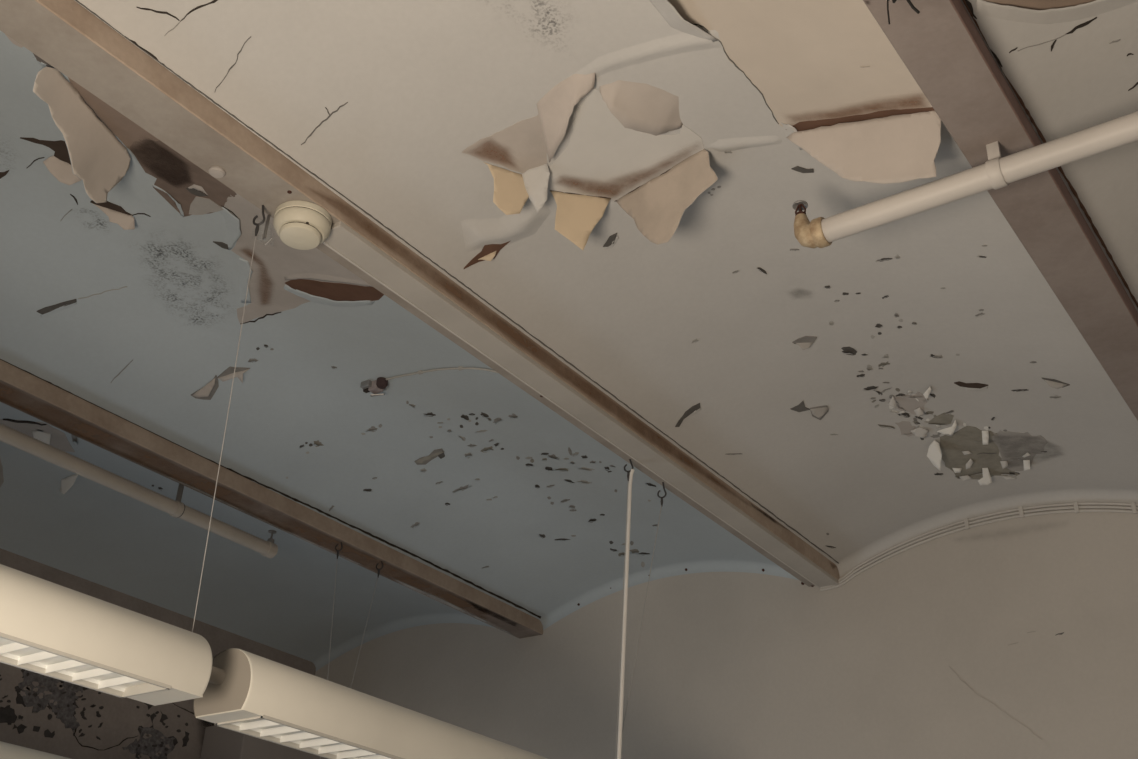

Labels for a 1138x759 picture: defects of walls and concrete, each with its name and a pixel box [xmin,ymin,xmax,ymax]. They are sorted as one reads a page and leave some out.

peeling [976,0,1138,25]
peeling [650,0,941,184]
peeling [462,73,721,251]
crack [75,0,839,564]
peeling [406,401,518,473]
spalling [841,347,1048,485]
peeling [516,447,615,512]
peeling [609,541,650,567]
spalling [0,669,104,740]
spalling [122,703,189,759]